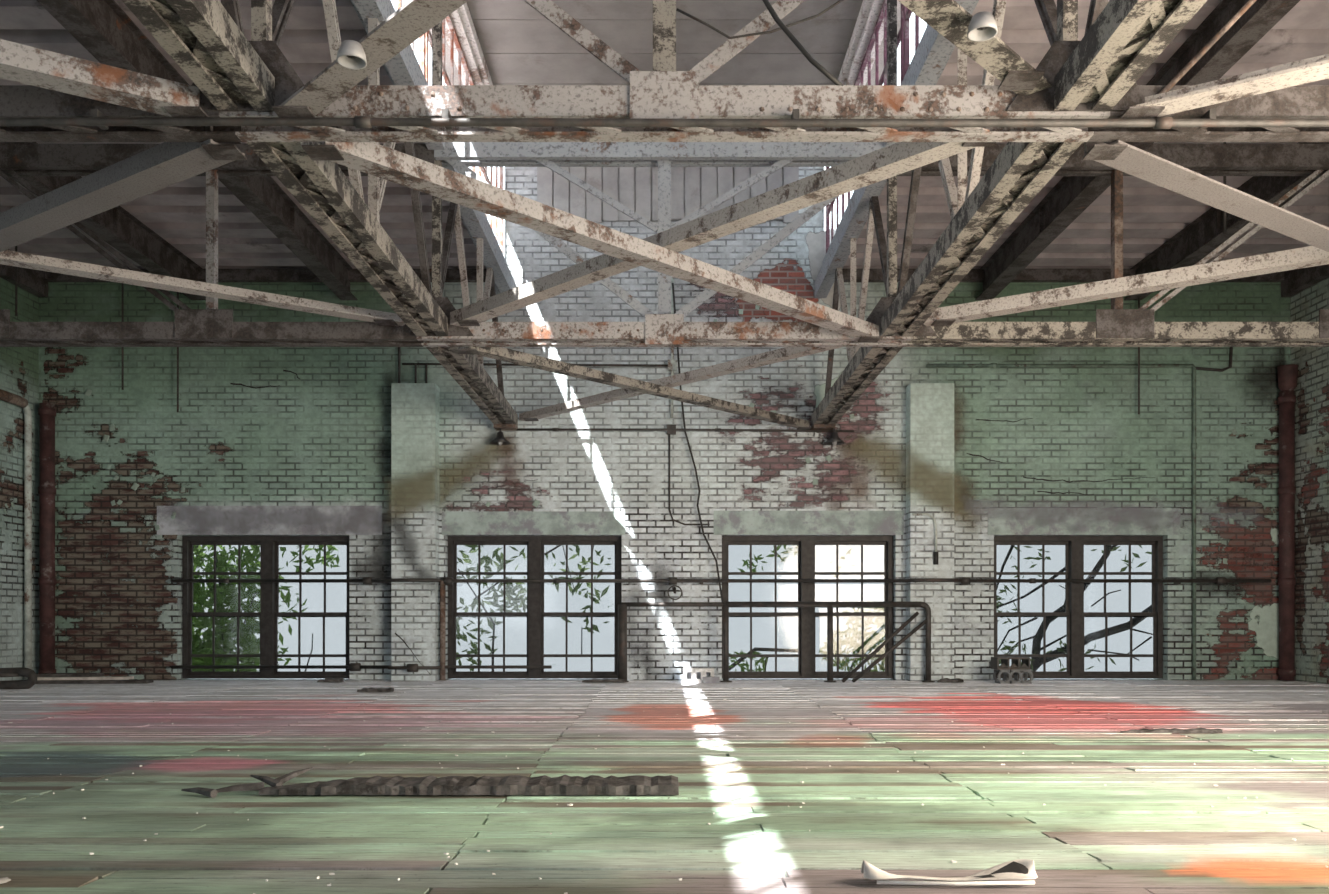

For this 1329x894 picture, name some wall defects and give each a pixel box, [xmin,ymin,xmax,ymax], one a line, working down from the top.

peeling [677,283,805,322]
spalling [753,258,819,303]
peeling [0,361,33,454]
peeling [0,469,35,514]
peeling [42,347,93,420]
peeling [55,424,201,680]
peeling [204,441,233,462]
peeling [719,371,897,510]
peeling [1196,400,1279,680]
peeling [1295,362,1329,684]